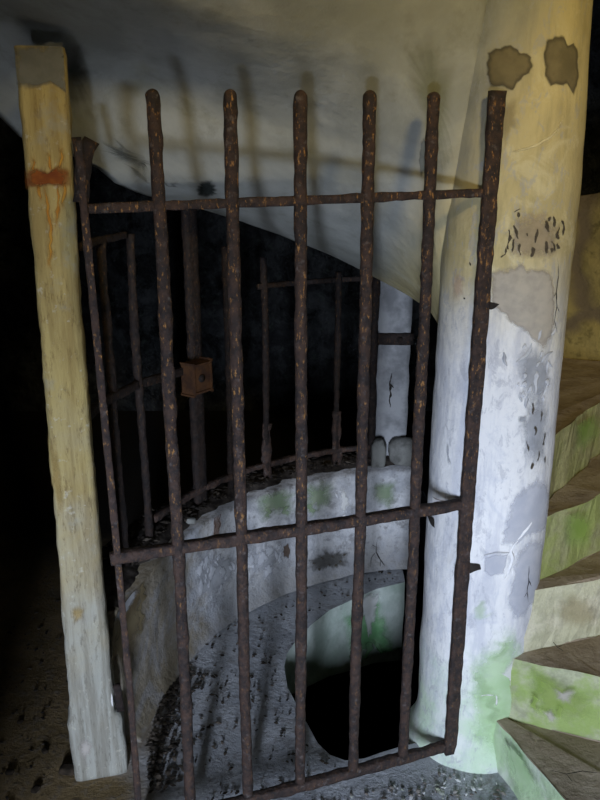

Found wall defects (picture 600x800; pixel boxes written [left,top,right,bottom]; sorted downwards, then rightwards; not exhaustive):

corrosion [28,151,68,263]
peeling [501,209,565,257]
crack [387,374,395,407]
flaking render [492,265,556,469]